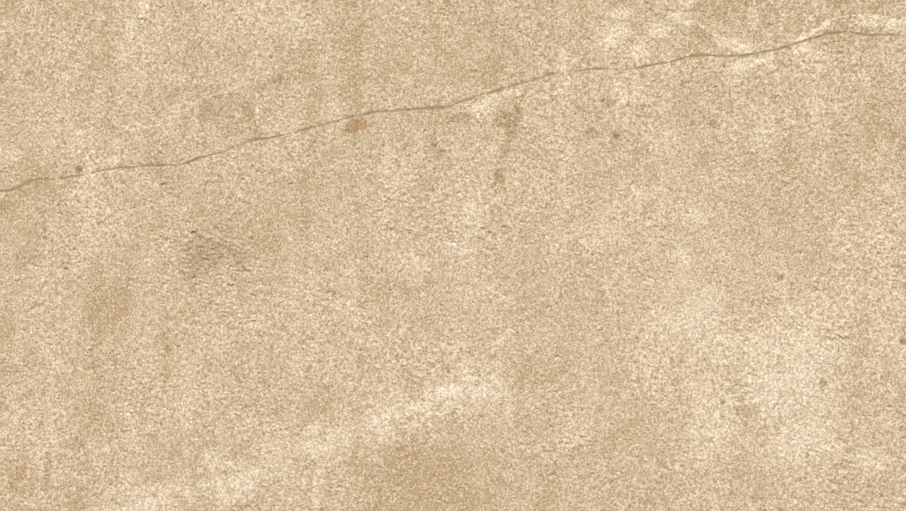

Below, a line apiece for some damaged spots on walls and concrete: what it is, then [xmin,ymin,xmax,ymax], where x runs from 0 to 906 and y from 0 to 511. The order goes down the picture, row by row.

crack [0,22,904,195]